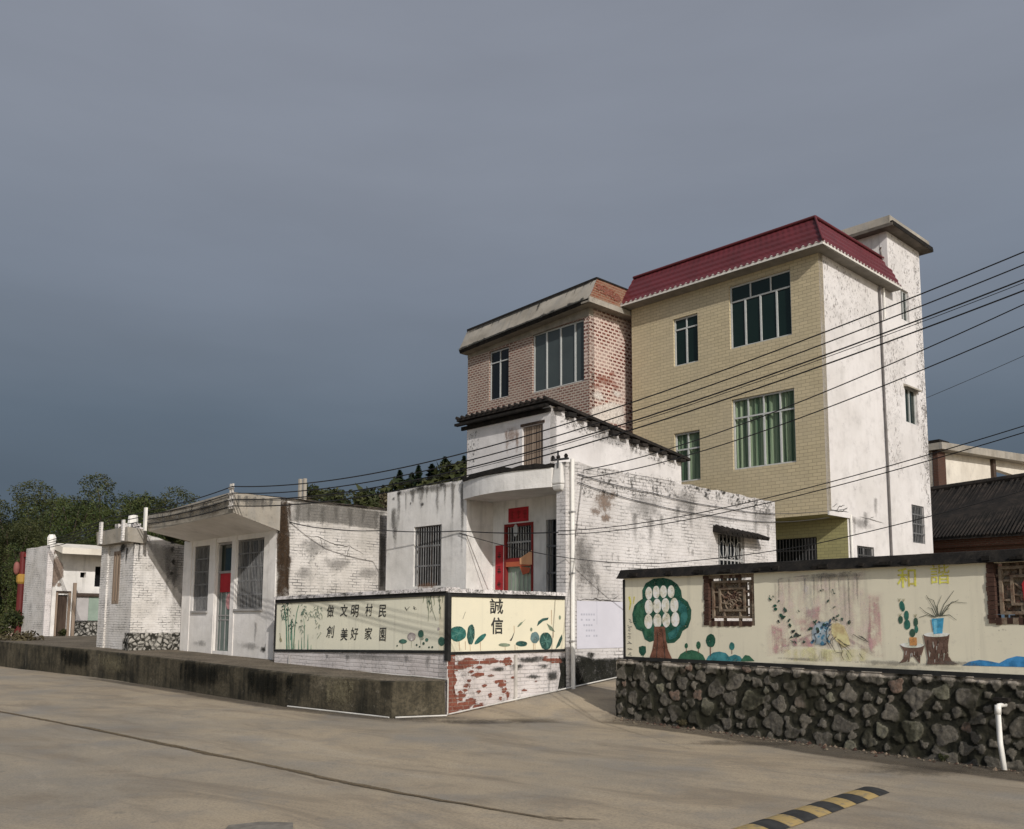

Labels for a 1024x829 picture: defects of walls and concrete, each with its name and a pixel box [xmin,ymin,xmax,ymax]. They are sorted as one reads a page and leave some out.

damp [148,479,463,596]
peeling [447,655,537,714]